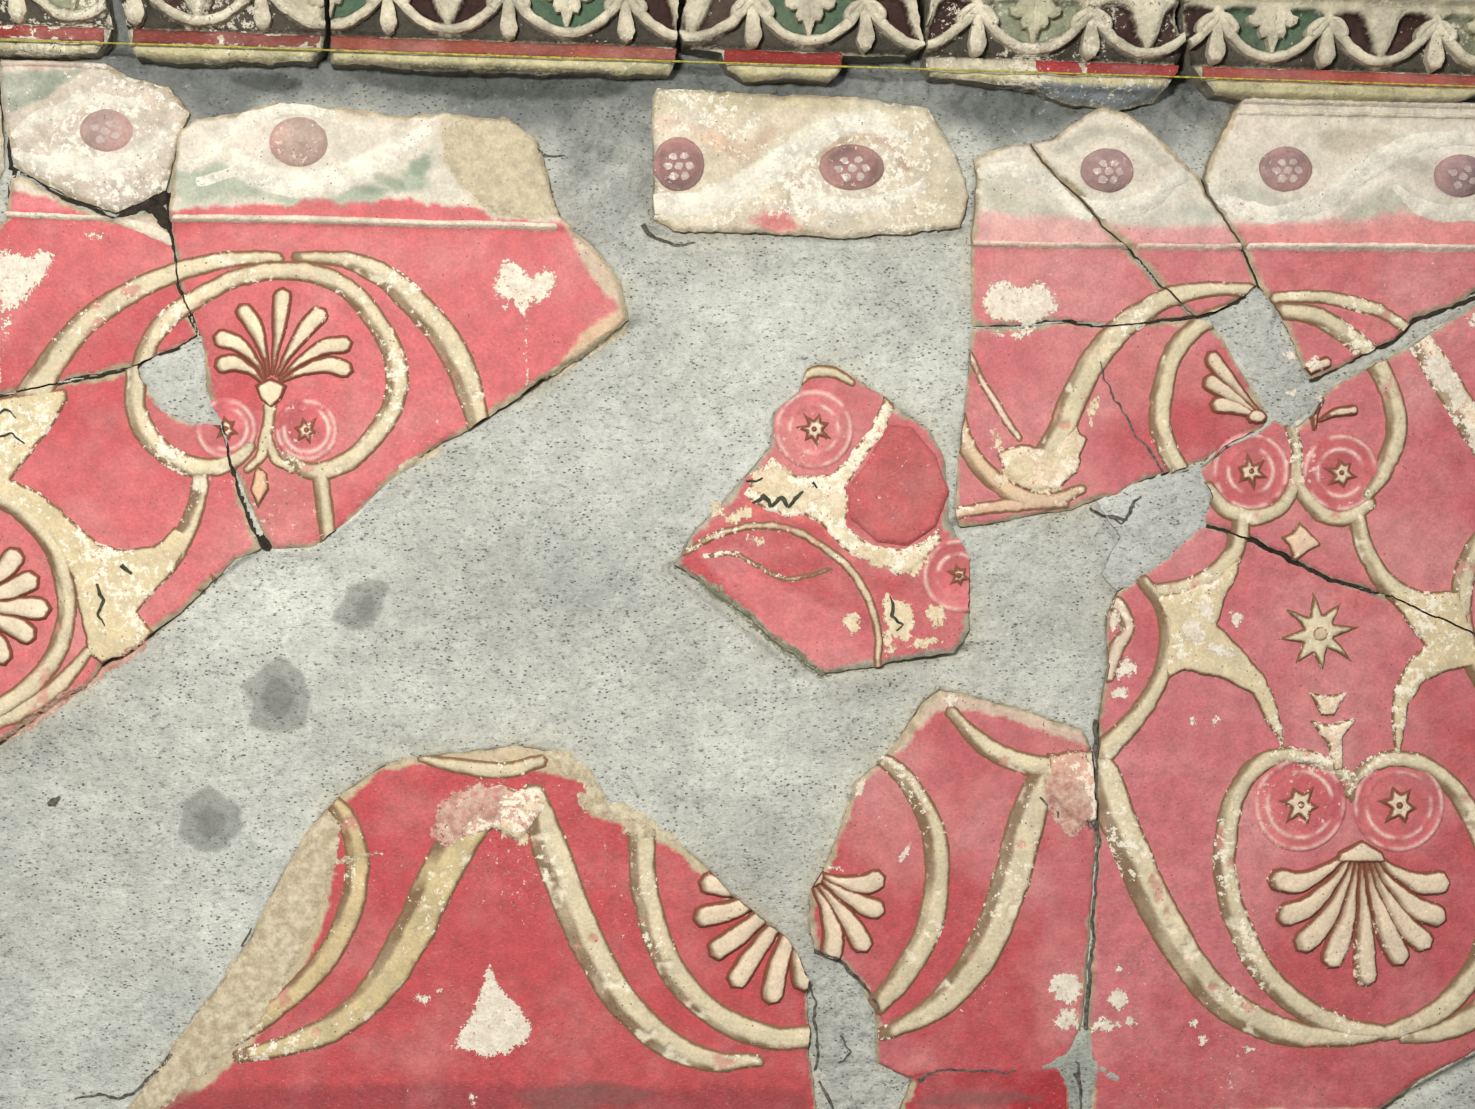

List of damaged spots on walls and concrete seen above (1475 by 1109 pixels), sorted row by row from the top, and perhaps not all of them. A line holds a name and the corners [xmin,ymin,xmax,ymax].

crack [0,86,200,444]
crack [1309,296,1475,382]
crack [221,422,272,551]
crack [96,563,133,626]
crack [1205,524,1475,636]
spalling [430,780,542,849]
spalling [1043,770,1093,837]
crack [1039,719,1101,1109]